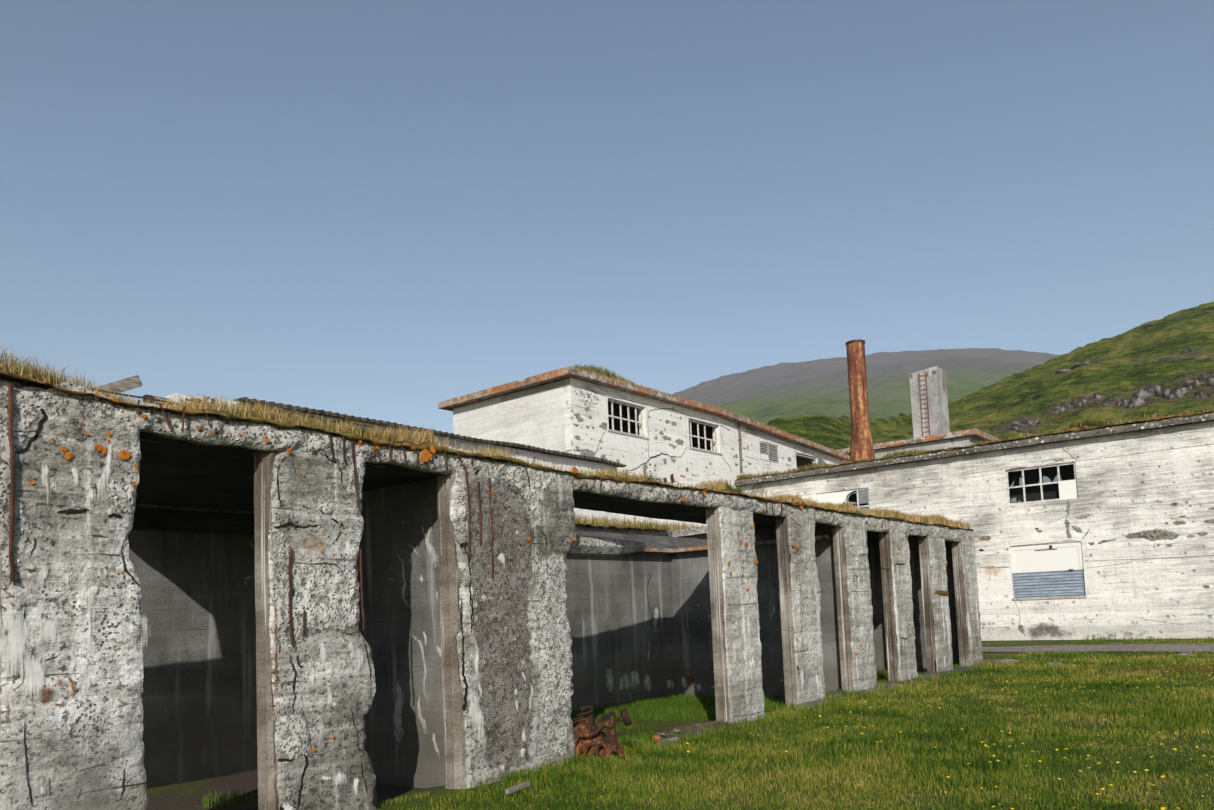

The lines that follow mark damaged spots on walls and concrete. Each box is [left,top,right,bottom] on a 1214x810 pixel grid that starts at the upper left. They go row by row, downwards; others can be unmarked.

crack [14,409,48,454]
spalling [571,391,630,494]
crack [588,387,689,471]
crack [57,509,141,586]
spalling [1064,501,1214,547]